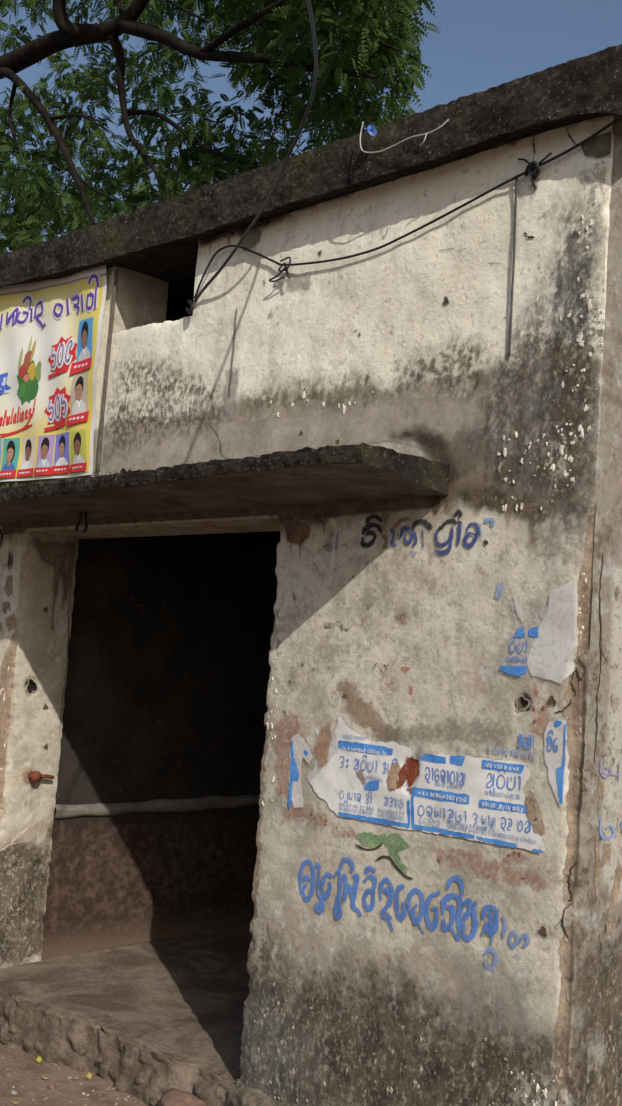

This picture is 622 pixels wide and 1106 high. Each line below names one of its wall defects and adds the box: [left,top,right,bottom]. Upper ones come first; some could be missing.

water stain [0,210,597,629]
spalling [0,575,19,823]
water stain [0,844,48,964]
crack [556,863,576,938]
water stain [241,943,558,1106]
water stain [576,951,622,1106]